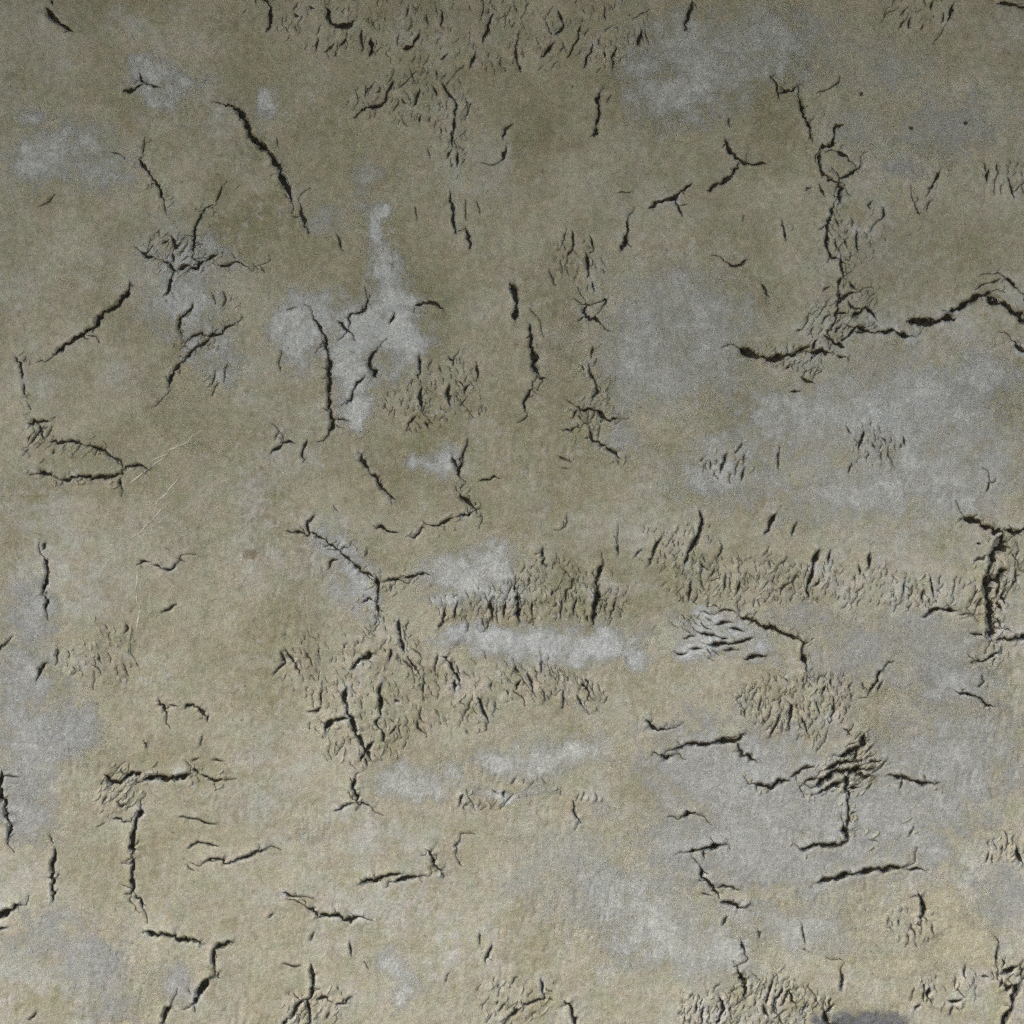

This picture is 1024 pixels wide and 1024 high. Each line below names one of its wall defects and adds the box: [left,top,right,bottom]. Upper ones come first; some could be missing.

crack [212,101,311,234]
crack [618,118,766,251]
crack [722,74,1024,363]
crack [15,138,271,494]
crack [559,287,628,469]
crack [289,439,497,632]
crack [923,468,1024,710]
crack [94,701,236,1024]
crack [268,892,371,970]
crack [360,833,475,885]
crack [668,811,761,999]
crack [646,720,942,933]